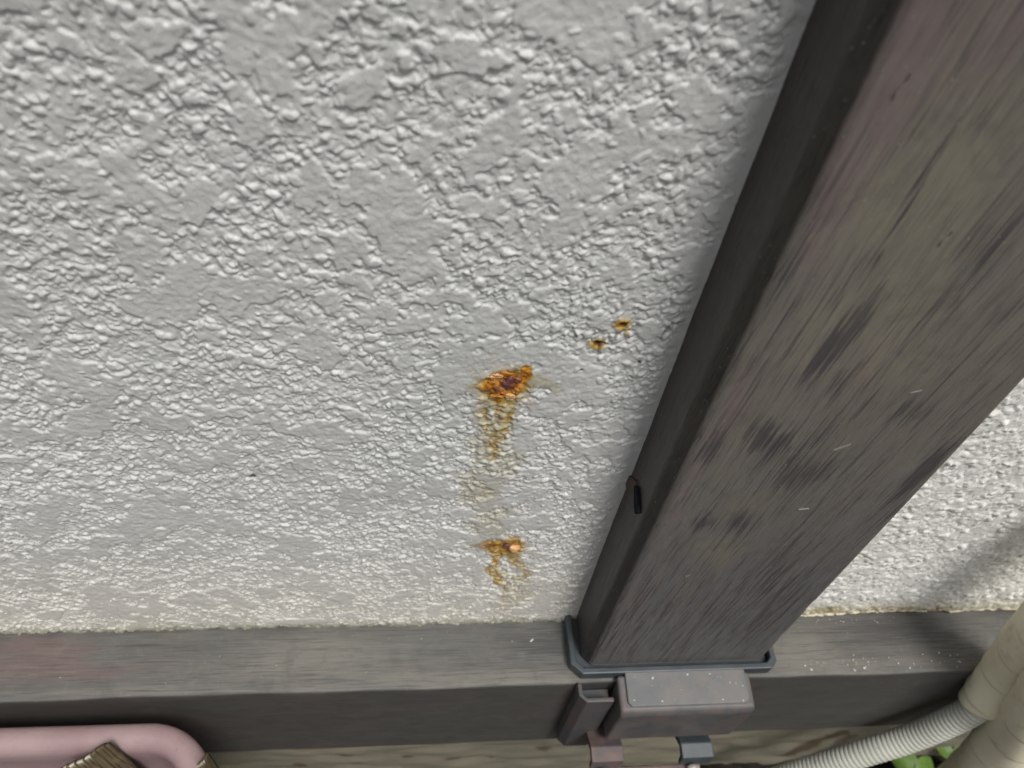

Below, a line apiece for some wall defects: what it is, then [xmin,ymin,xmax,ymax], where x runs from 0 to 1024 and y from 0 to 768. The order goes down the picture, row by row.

rust [588,339,605,351]
rust [615,320,631,338]
rust [479,366,533,457]
rust [483,536,530,585]